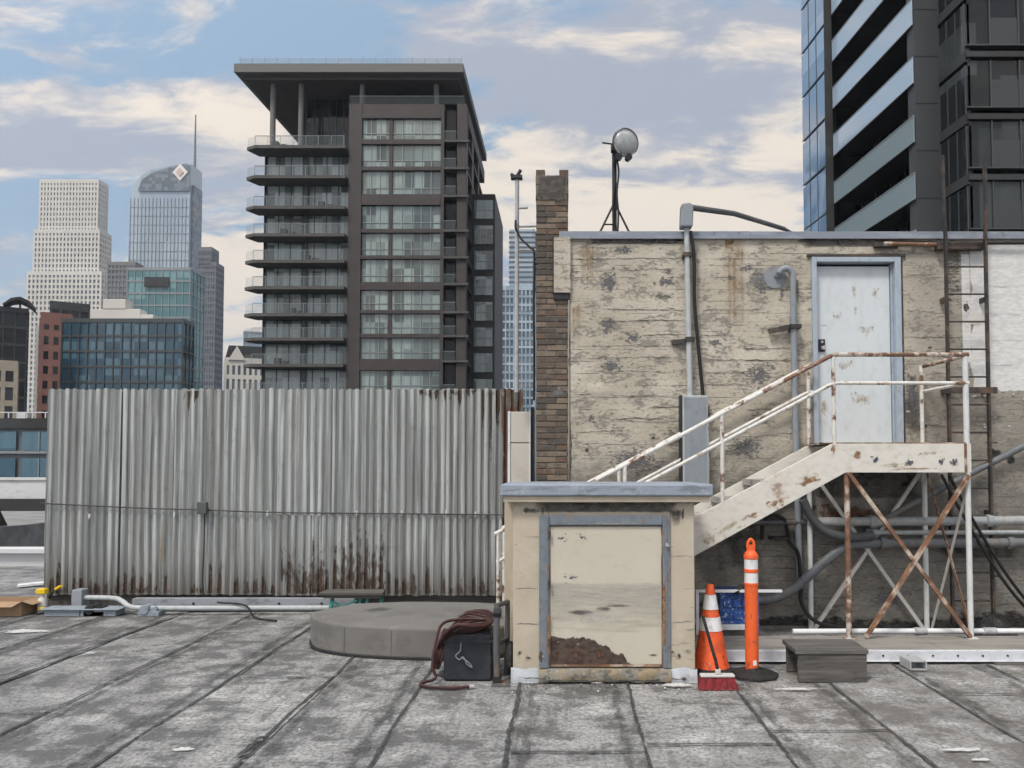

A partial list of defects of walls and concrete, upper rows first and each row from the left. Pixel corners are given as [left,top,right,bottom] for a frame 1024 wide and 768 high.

peeling [651,269,675,299]
peeling [751,280,801,302]
peeling [741,363,775,389]
peeling [906,373,927,428]
corrosion [419,390,500,449]
peeling [726,412,768,459]
corrosion [49,563,171,593]
corrosion [185,563,222,593]
corrosion [234,536,493,594]